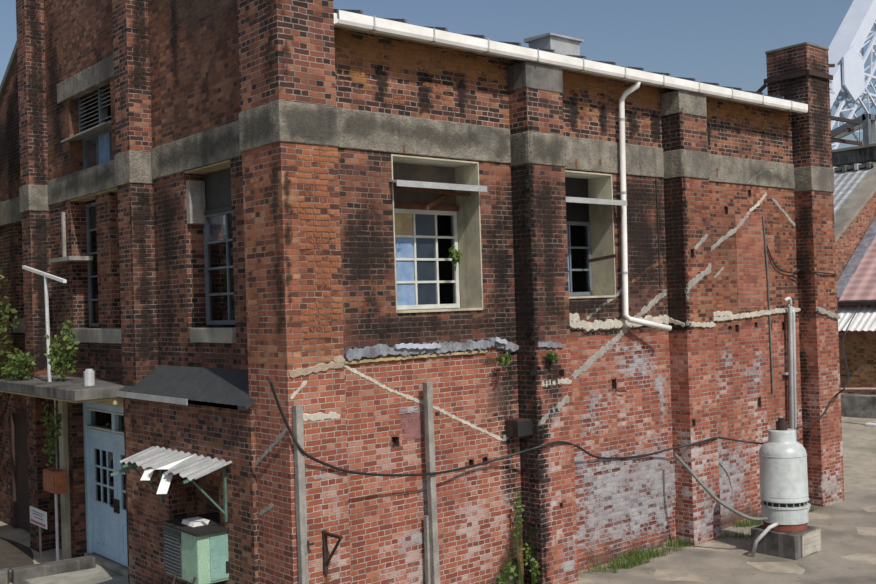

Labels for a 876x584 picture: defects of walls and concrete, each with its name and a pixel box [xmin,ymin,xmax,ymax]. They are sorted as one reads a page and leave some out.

water stain [334,29,506,114]
water stain [491,126,676,584]